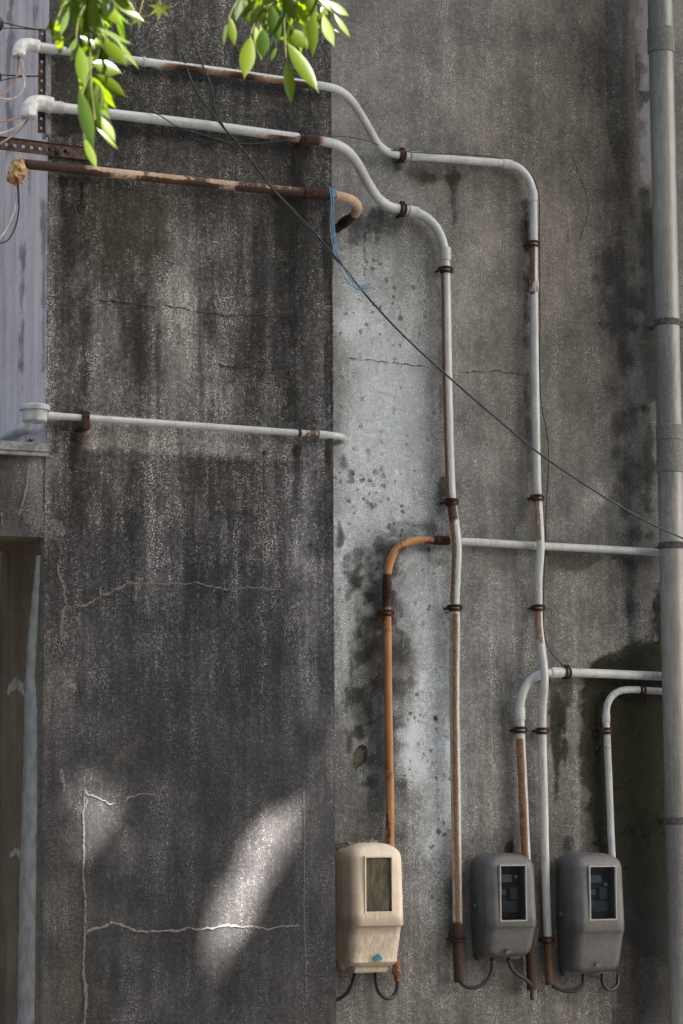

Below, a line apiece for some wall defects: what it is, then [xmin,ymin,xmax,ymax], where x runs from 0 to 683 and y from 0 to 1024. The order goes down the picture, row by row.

water stain [59,176,91,349]
water stain [114,66,320,354]
water stain [321,207,330,277]
crack [329,238,520,428]
water stain [592,243,642,376]
crack [56,545,281,639]
water stain [291,445,302,513]
water stain [325,443,346,479]
water stain [338,524,364,601]
water stain [612,426,655,624]
crack [82,789,307,1024]